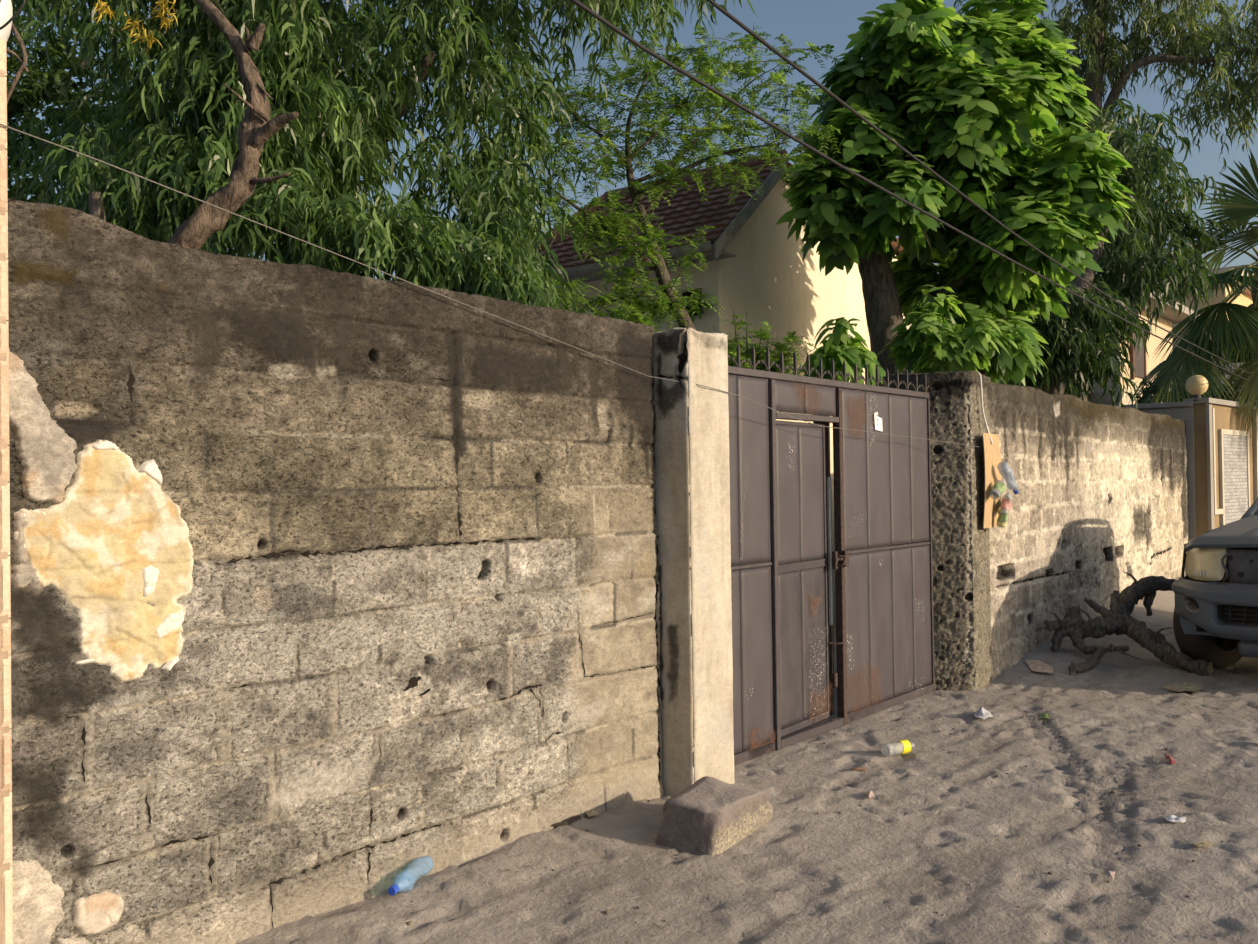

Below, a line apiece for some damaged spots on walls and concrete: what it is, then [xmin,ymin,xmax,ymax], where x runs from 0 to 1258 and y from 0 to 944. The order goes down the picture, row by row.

flaking render [7,348,194,683]
damp [445,321,614,466]
spalling [677,329,688,375]
damp [930,373,973,421]
damp [987,383,1131,480]
damp [1134,505,1153,548]
damp [1148,418,1188,537]
damp [12,585,80,663]
damp [658,566,678,701]
damp [12,765,96,876]